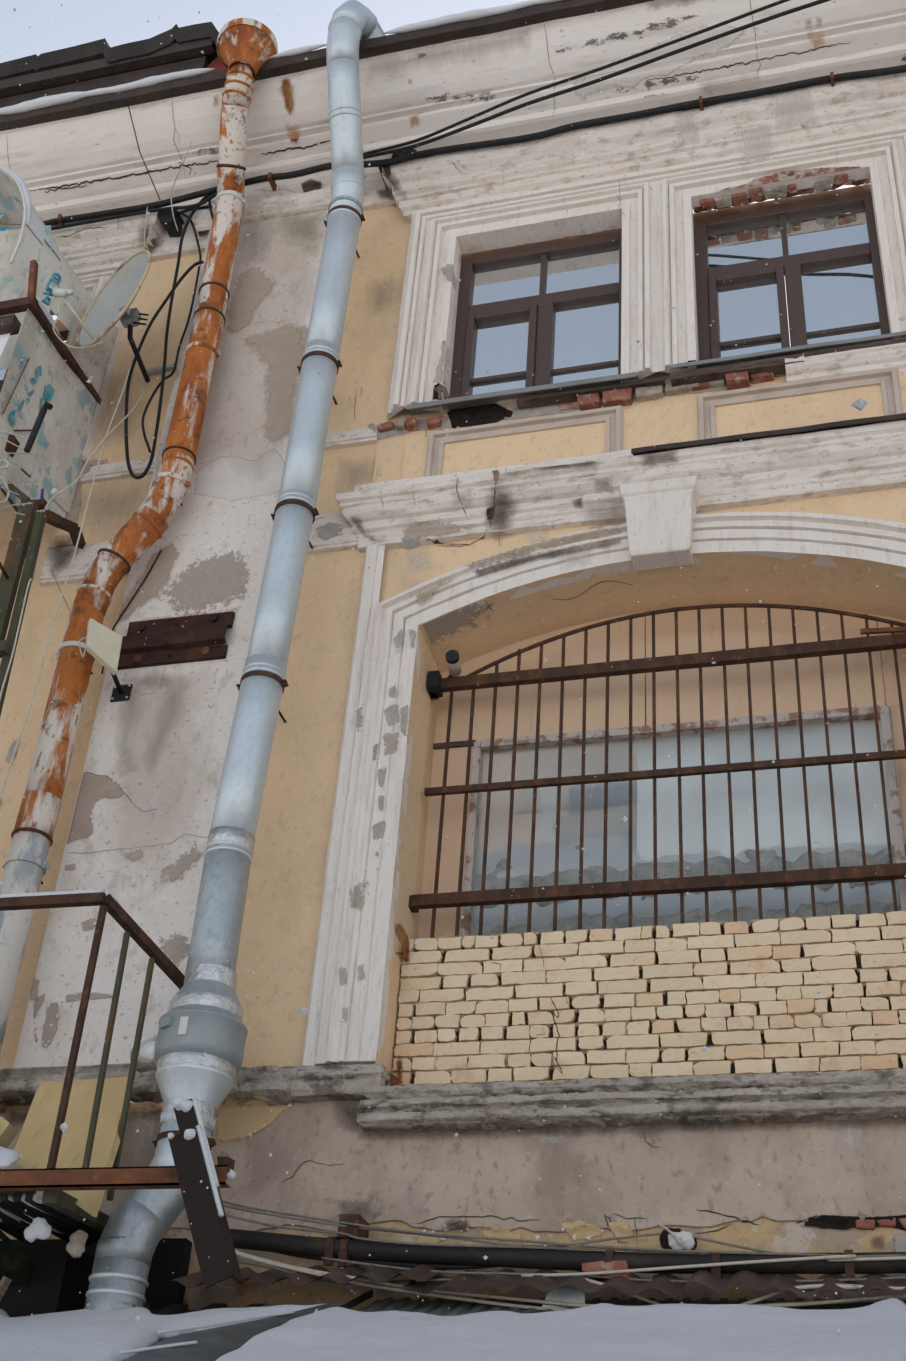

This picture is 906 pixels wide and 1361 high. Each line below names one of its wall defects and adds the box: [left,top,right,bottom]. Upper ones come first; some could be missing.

rust [281,79,298,141]
spalling [707,166,861,211]
flaking render [368,340,786,440]
water stain [492,492,512,527]
peeling [119,545,256,620]
flaking render [67,773,123,844]
crack [416,1215,540,1232]
crack [604,1213,644,1243]
crack [696,1209,759,1234]
flaking render [801,1213,906,1252]